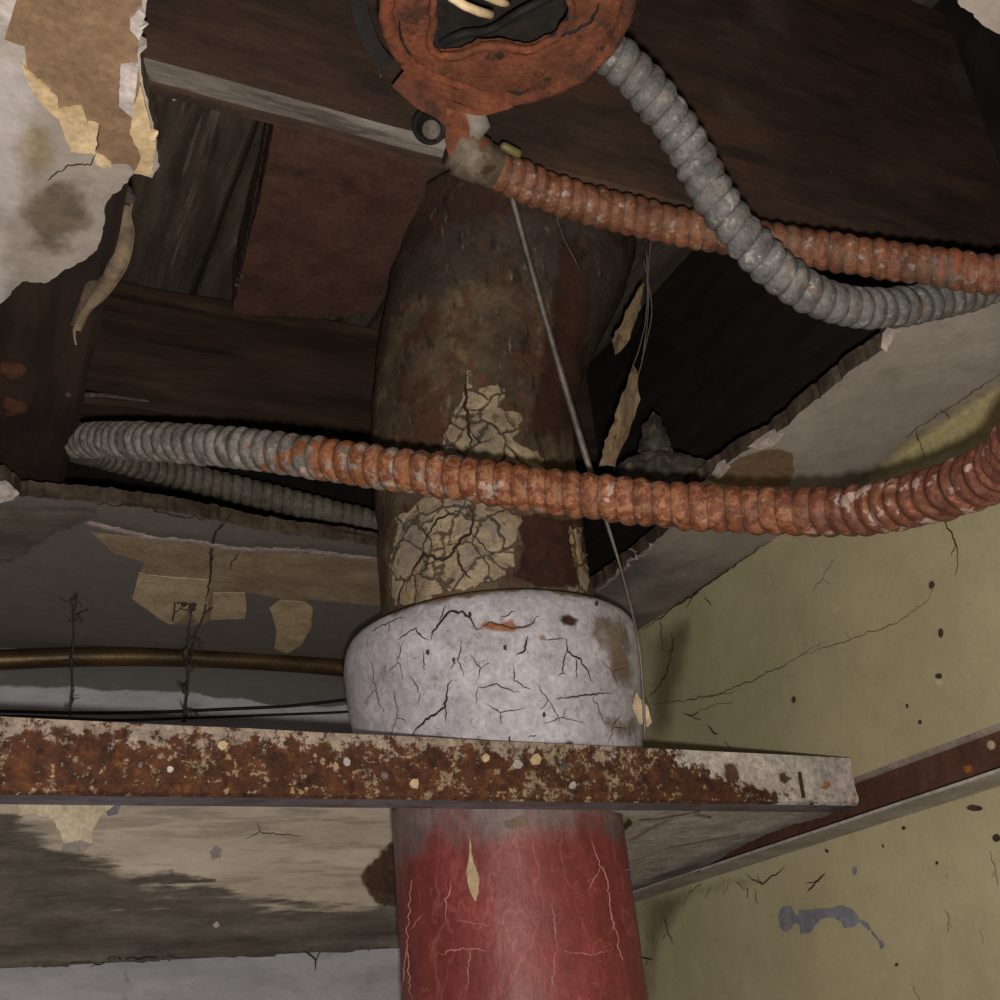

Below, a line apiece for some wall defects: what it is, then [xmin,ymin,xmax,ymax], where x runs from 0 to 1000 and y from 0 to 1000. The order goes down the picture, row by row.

peeling [0,0,158,176]
leakage [33,184,84,248]
peeling [70,185,137,345]
rust [533,240,590,437]
peeling [435,370,546,468]
crack [95,502,244,600]
peeling [84,497,522,654]
crack [365,605,625,742]
crack [643,541,933,748]
rust [725,763,739,782]
leakage [0,814,400,968]
crack [401,880,499,998]